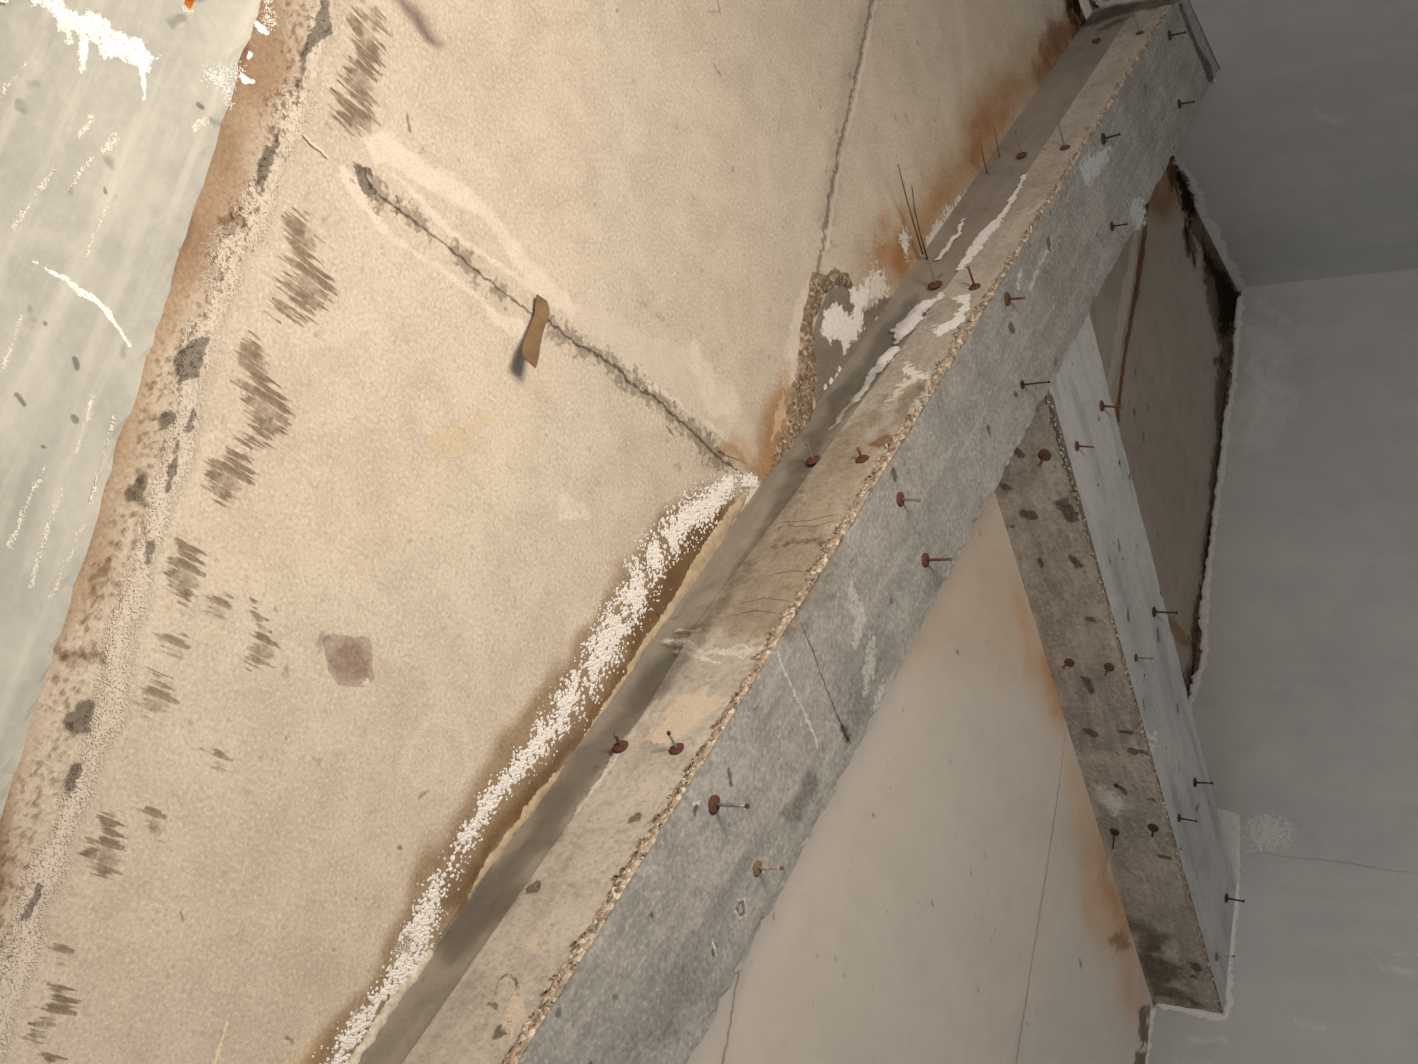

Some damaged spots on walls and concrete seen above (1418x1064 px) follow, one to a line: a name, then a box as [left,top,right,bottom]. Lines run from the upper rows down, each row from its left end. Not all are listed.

leakage [28,0,161,101]
leakage [201,61,247,110]
leakage [256,0,277,31]
crack [825,0,877,251]
leakage [32,260,132,348]
leakage [339,165,542,342]
leakage [899,174,1026,270]
leakage [1170,166,1238,445]
leakage [770,346,798,447]
spalling [501,12,1166,1064]
leakage [312,379,766,1064]